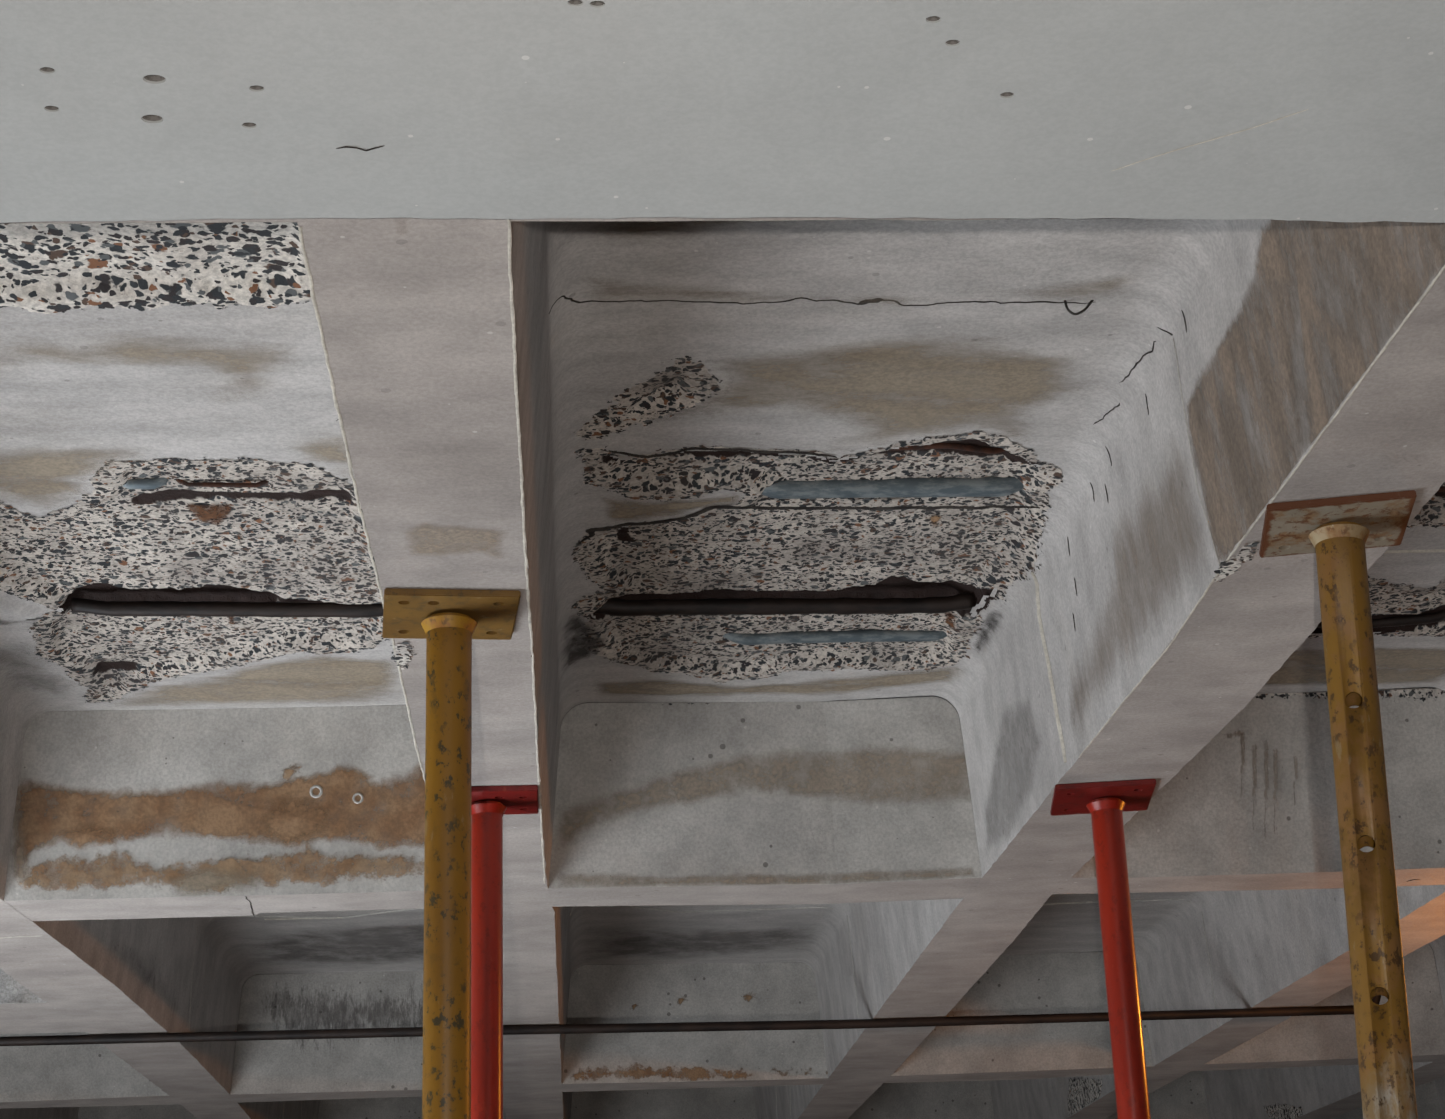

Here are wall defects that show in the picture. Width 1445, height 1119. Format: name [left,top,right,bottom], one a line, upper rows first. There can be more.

spalling [0,222,311,314]
crack [549,295,1094,314]
water stain [725,345,1054,431]
spalling [571,356,1063,683]
spalling [1407,482,1445,528]
spalling [0,457,417,703]
spalling [1307,621,1323,639]
spalling [1368,575,1445,637]
corrosion [16,767,425,894]